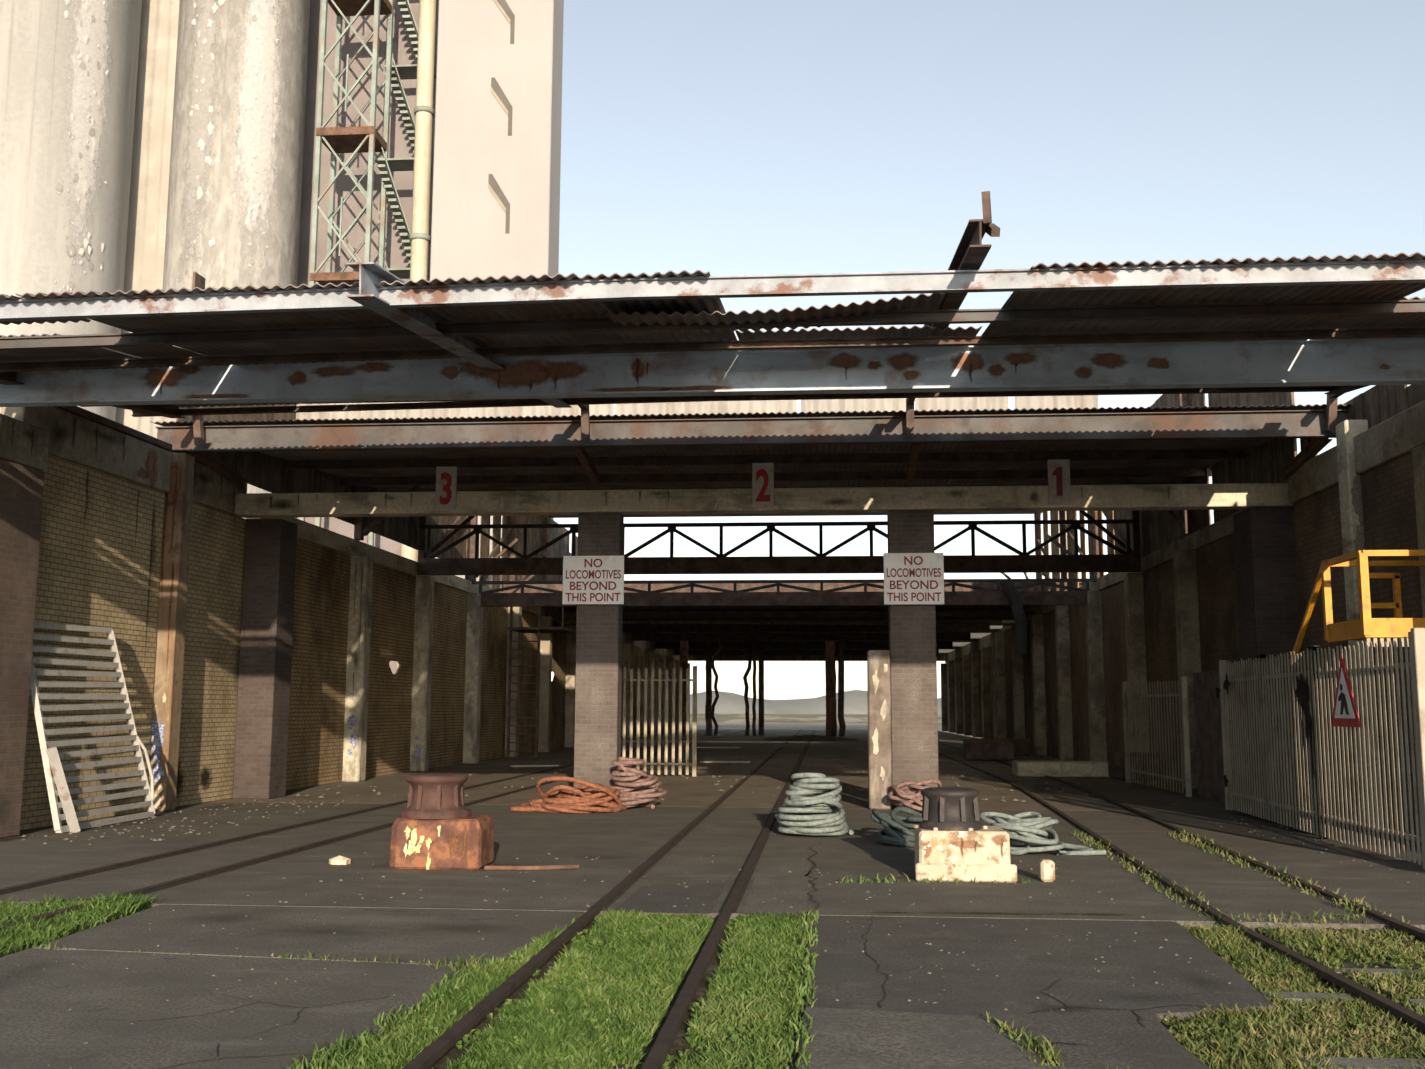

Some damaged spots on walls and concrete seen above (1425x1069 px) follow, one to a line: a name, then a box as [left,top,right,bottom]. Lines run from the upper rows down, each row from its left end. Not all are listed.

peeling [54,0,112,292]
peeling [179,0,283,285]
rust [145,366,247,399]
rust [289,363,391,384]
rust [442,360,586,391]
rust [596,359,729,392]
rust [829,353,919,380]
rust [952,353,1034,382]
rust [1075,353,1125,378]
rust [1148,358,1169,368]